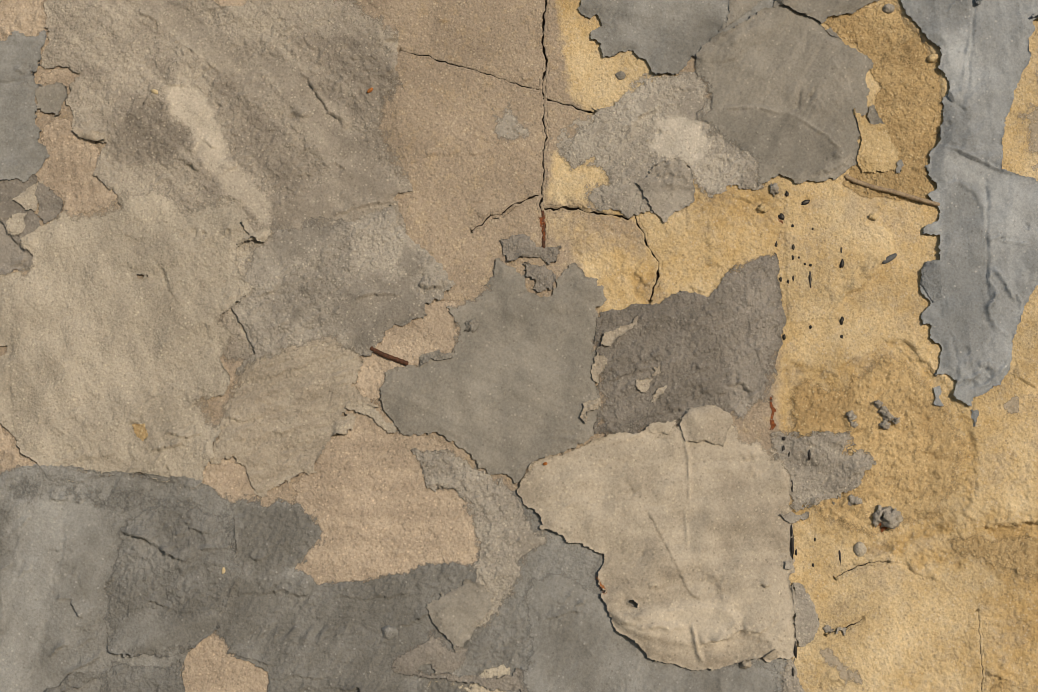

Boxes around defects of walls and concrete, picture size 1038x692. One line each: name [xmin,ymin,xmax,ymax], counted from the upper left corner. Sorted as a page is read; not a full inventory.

peeling [0,0,48,41]
spalling [824,0,944,202]
peeling [6,118,118,236]
crack [400,0,663,300]
peeling [0,423,37,475]
peeling [202,456,256,503]
peeling [290,300,481,585]
peeling [649,405,733,447]
spalling [778,355,970,537]
peeling [180,631,270,692]
peeling [427,664,511,692]